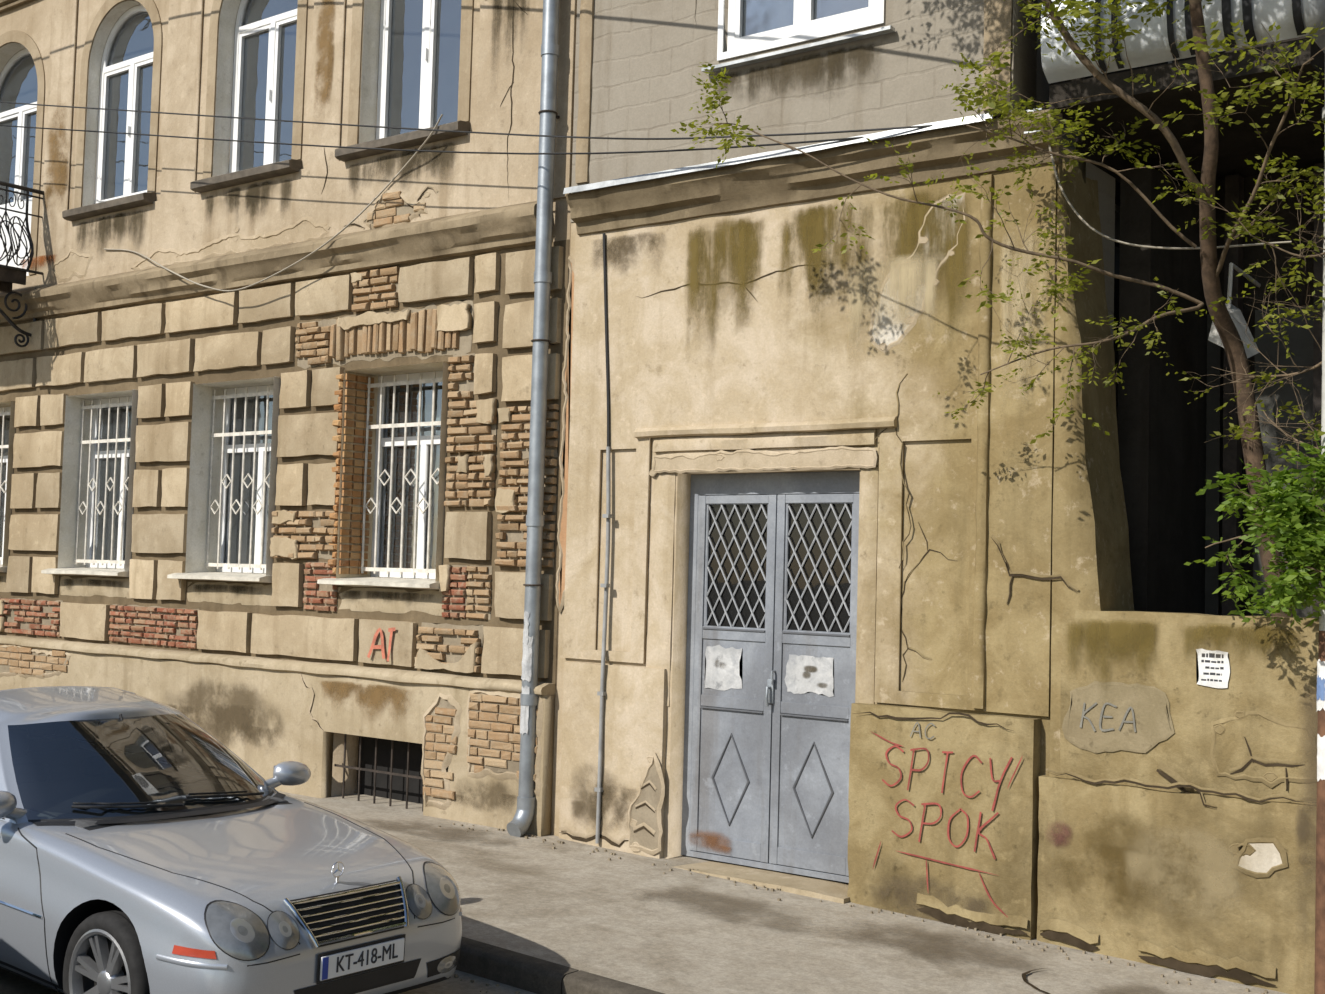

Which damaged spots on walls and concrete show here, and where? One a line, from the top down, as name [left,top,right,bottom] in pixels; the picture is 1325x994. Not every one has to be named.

water stain [494,0,525,25]
water stain [47,124,66,194]
water stain [688,219,758,326]
flaking render [414,256,575,673]
crack [875,374,958,682]
crack [991,535,1079,604]
flaking render [0,598,71,679]
flaking render [108,604,199,648]
spalling [421,611,543,810]
crack [853,712,1013,731]
crack [1048,736,1306,808]
spalling [1229,837,1288,878]